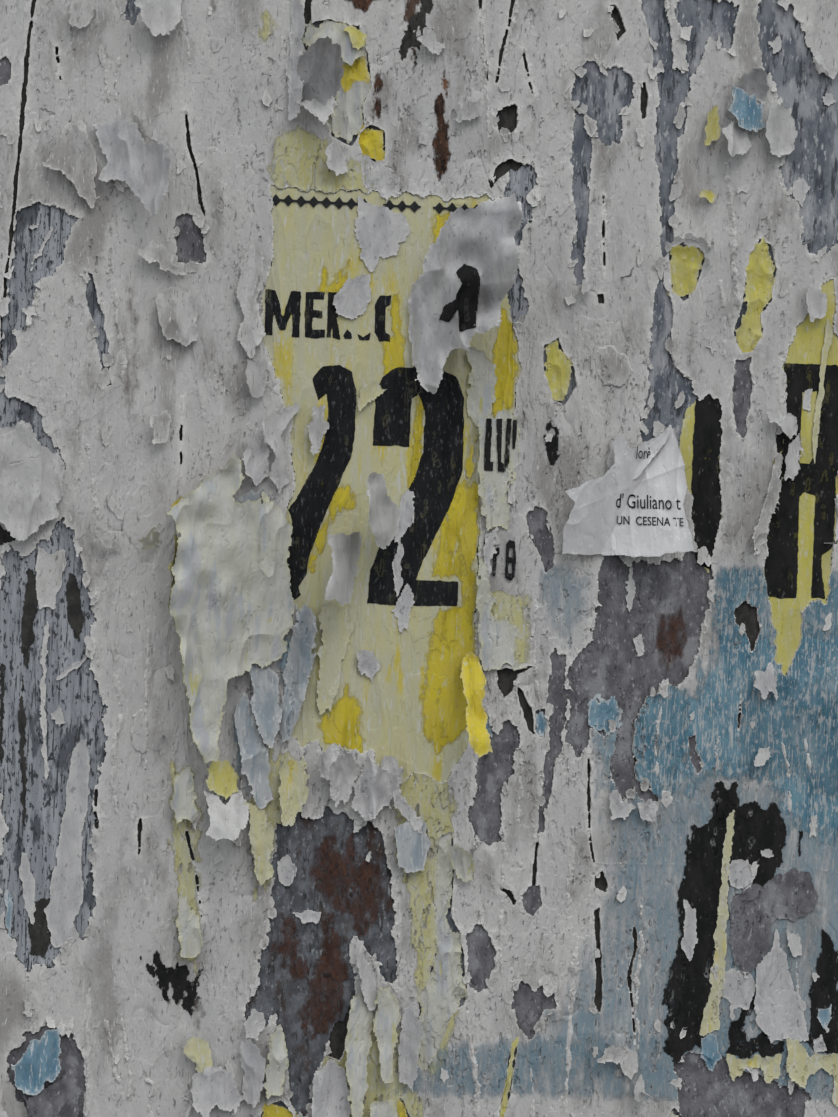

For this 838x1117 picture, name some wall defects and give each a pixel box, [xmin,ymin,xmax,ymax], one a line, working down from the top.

crack [0,0,61,360]
peeling [42,107,186,216]
corrosion [348,0,373,12]
corrosion [399,0,434,66]
corrosion [432,75,451,179]
peeling [564,0,739,447]
peeling [704,0,838,263]
peeling [0,202,108,971]
peeling [139,402,431,1117]
peeling [446,652,520,882]
peeling [534,546,716,833]
corrosion [276,833,380,1040]